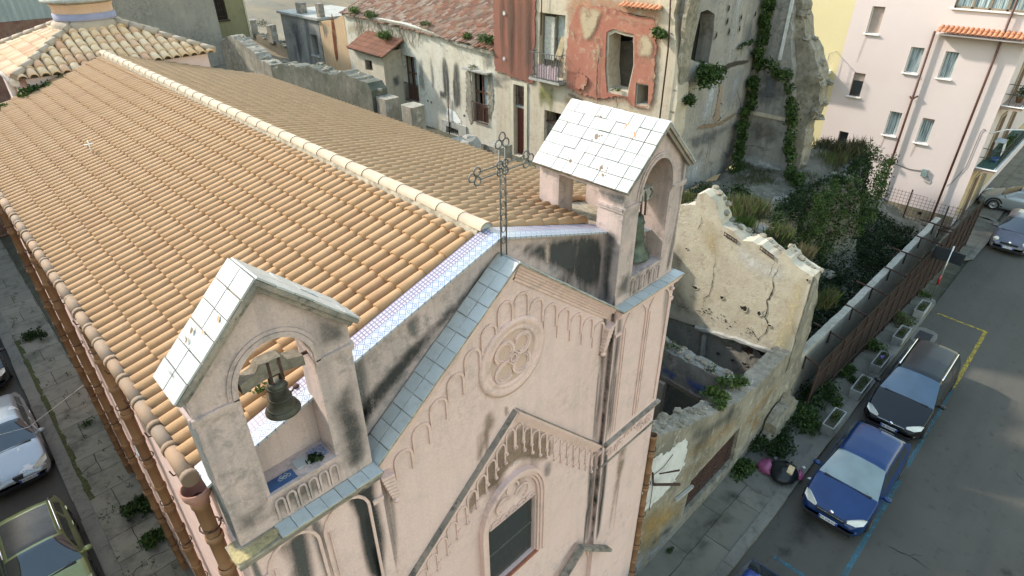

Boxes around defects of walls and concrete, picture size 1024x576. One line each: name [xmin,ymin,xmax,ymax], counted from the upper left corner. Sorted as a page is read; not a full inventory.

flaking render [566,1,615,60]
flaking render [638,35,652,56]
crack [757,265,780,343]
leakage [525,234,628,538]
leakage [469,429,551,509]
flaking render [642,438,688,511]